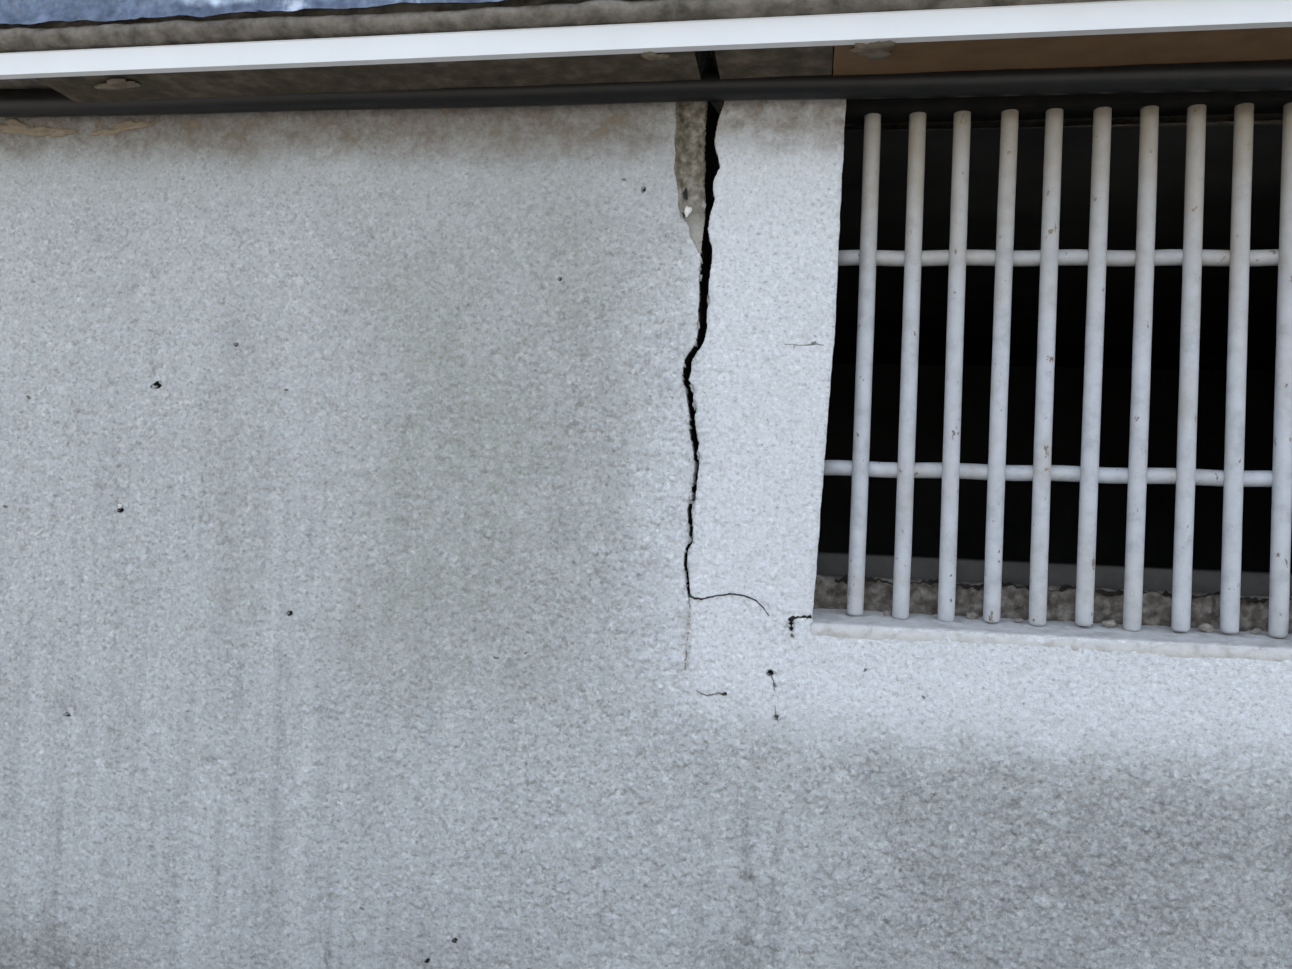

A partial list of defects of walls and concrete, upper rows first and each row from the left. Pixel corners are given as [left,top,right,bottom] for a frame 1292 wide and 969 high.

spalling [674,101,708,253]
crack [681,50,769,696]